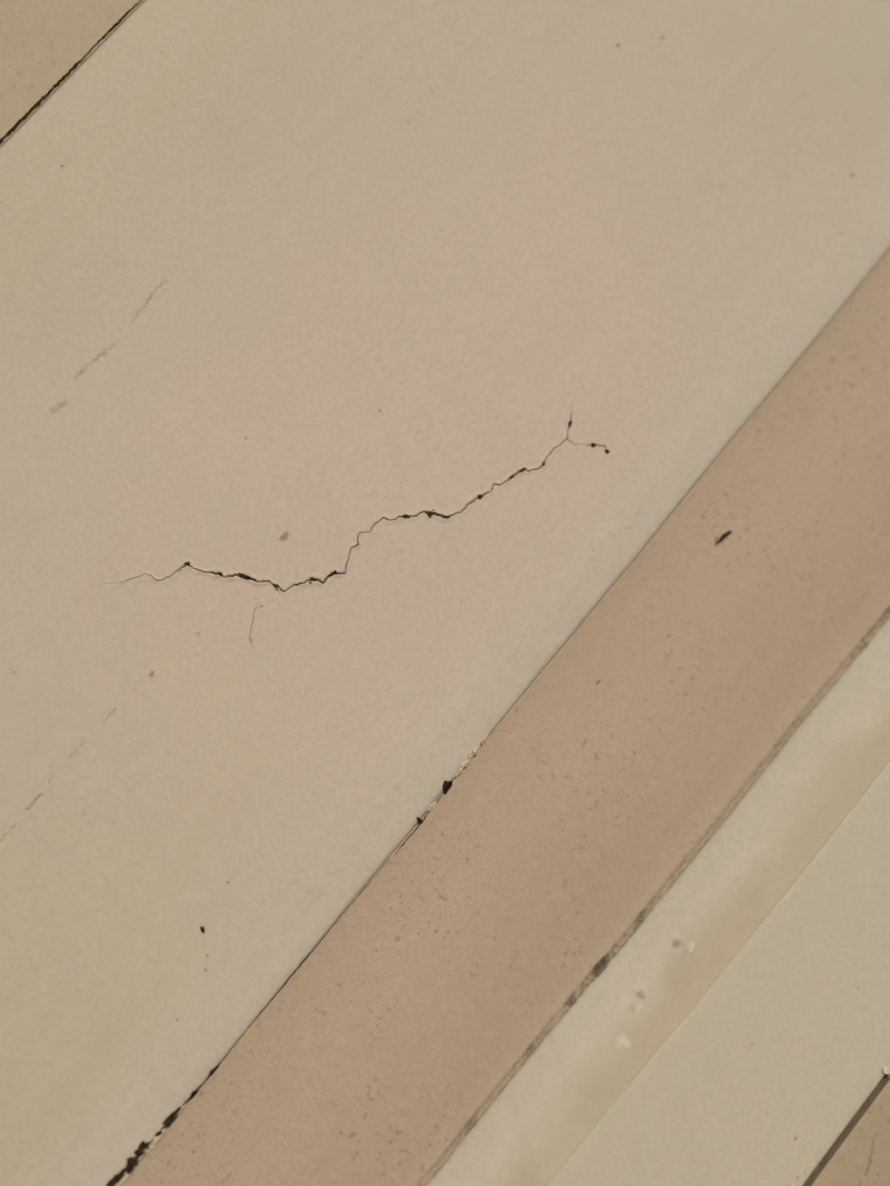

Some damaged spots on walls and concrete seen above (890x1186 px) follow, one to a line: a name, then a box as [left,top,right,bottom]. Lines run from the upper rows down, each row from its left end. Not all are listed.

crack [97,415,610,607]